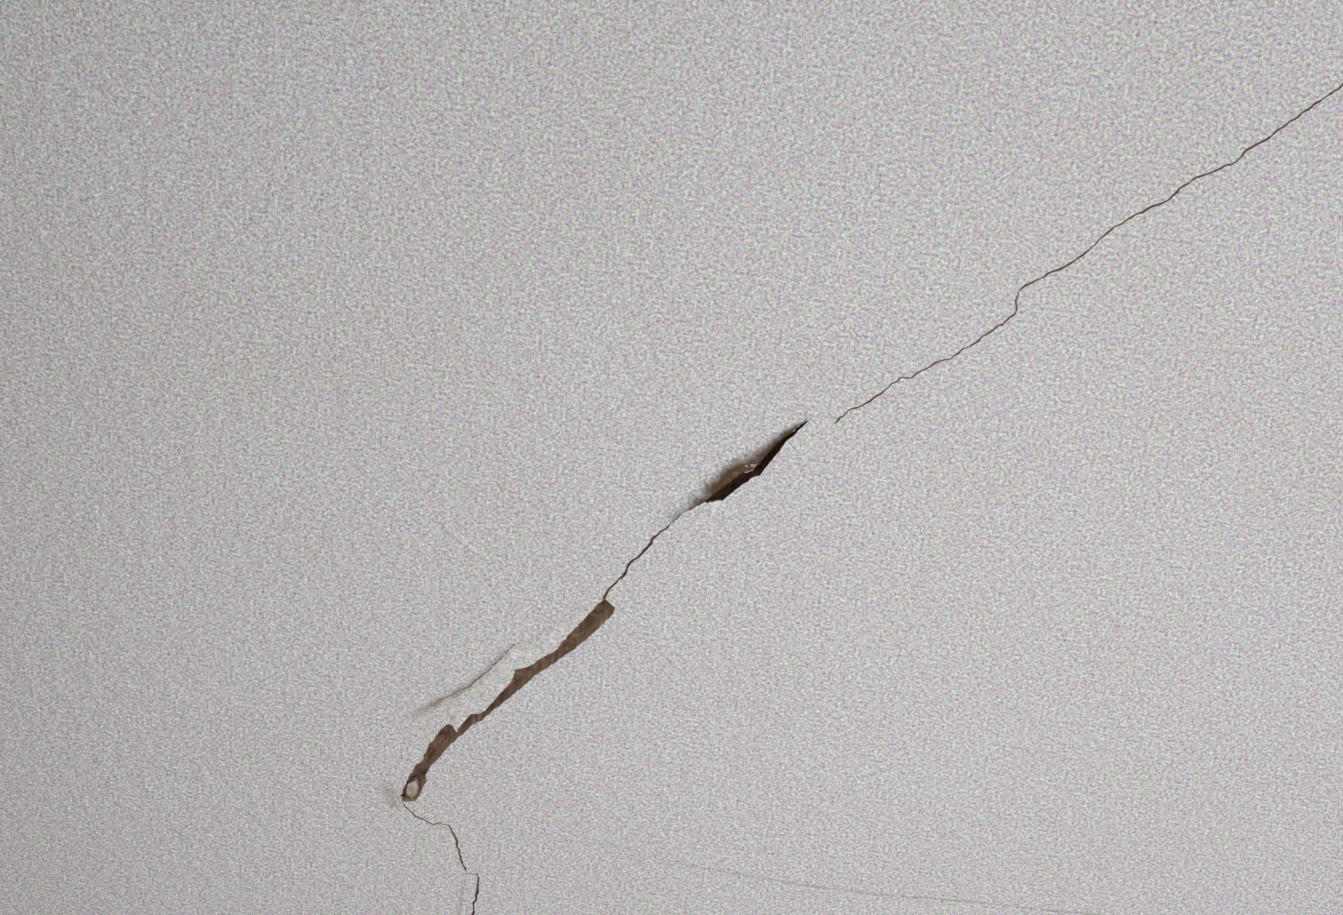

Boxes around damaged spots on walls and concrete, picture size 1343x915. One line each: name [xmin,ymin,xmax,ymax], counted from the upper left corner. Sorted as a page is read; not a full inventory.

crack [834,83,1343,424]
crack [603,508,693,601]
crack [401,800,480,915]